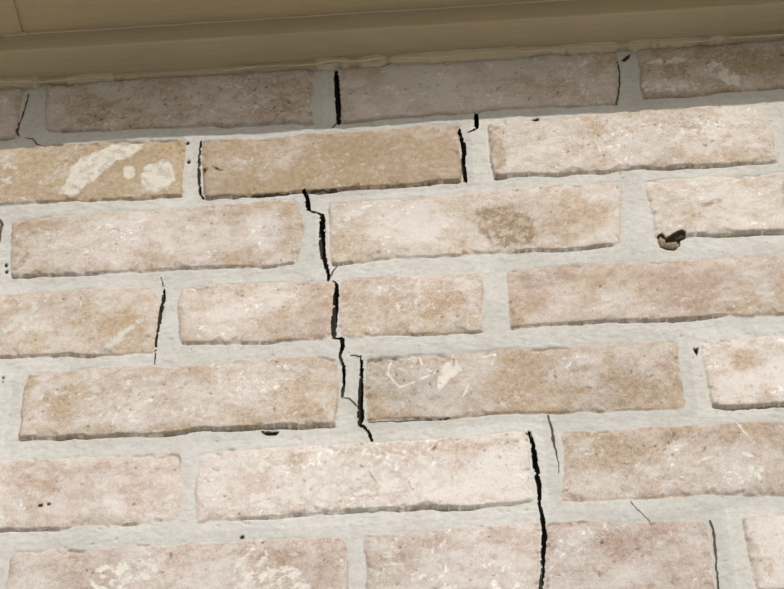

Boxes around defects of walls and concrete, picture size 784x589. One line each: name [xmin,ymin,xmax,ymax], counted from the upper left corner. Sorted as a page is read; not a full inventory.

crack [332,75,341,128]
crack [460,116,479,183]
crack [154,280,166,365]
crack [228,188,418,442]
crack [525,415,559,589]